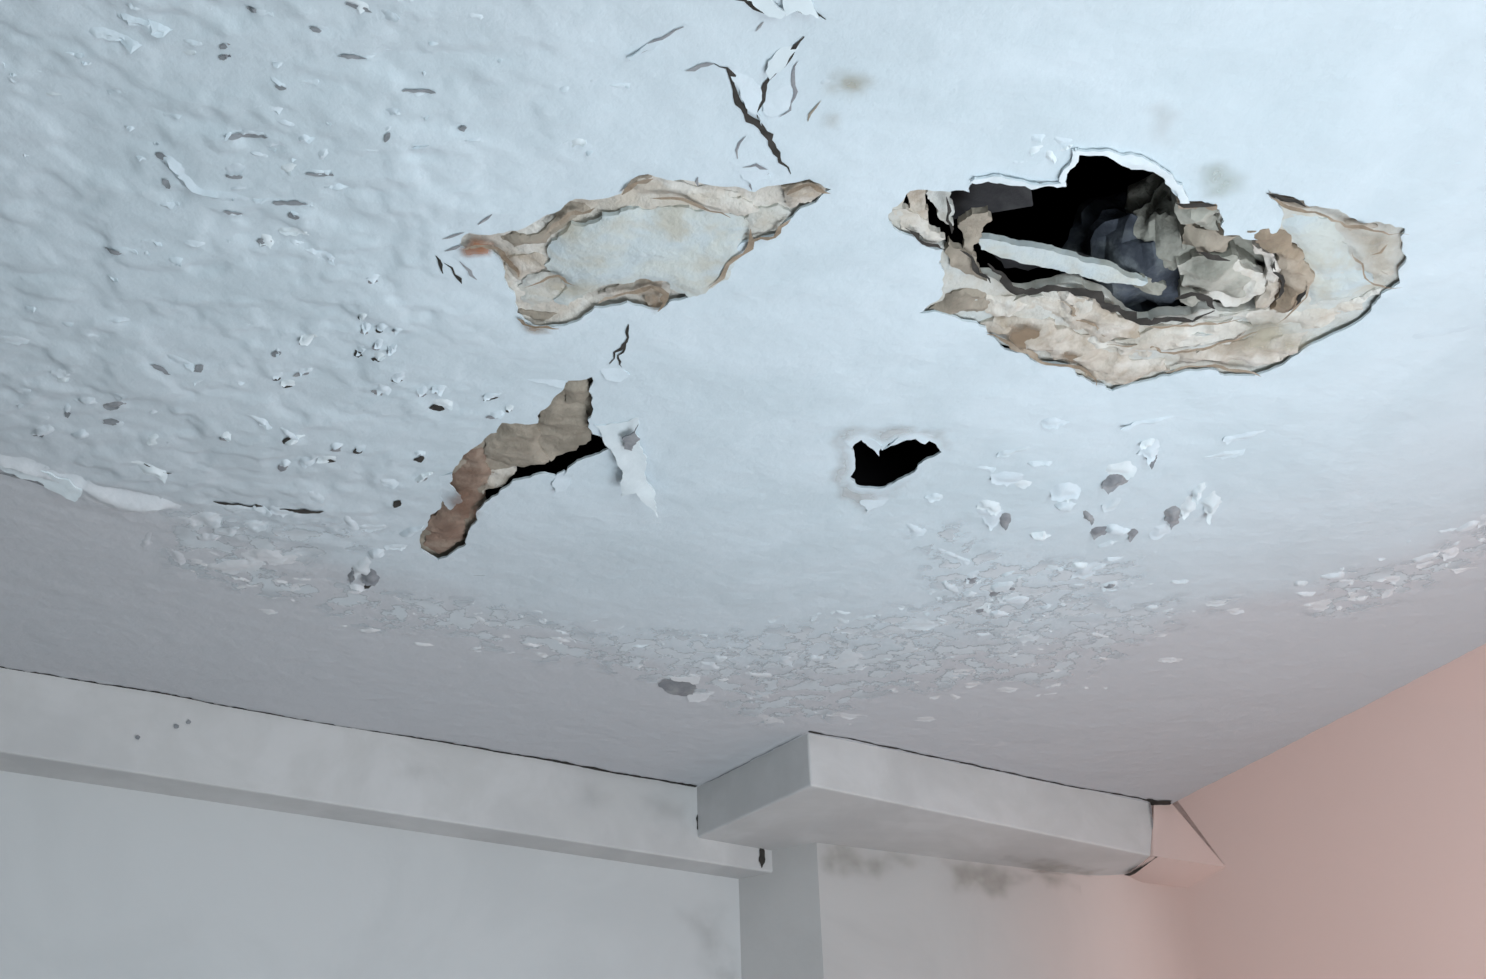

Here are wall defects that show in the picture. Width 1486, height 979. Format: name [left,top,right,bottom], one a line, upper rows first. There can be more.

peeling [738,0,826,31]
crack [687,37,804,190]
spalling [460,174,830,329]
spalling [903,134,1154,283]
peeling [30,392,127,439]
peeling [272,348,314,388]
peeling [354,313,403,362]
spalling [170,371,658,592]
spalling [851,439,940,487]
peeling [895,415,1222,643]
peeling [1294,514,1486,614]
spalling [658,675,715,703]